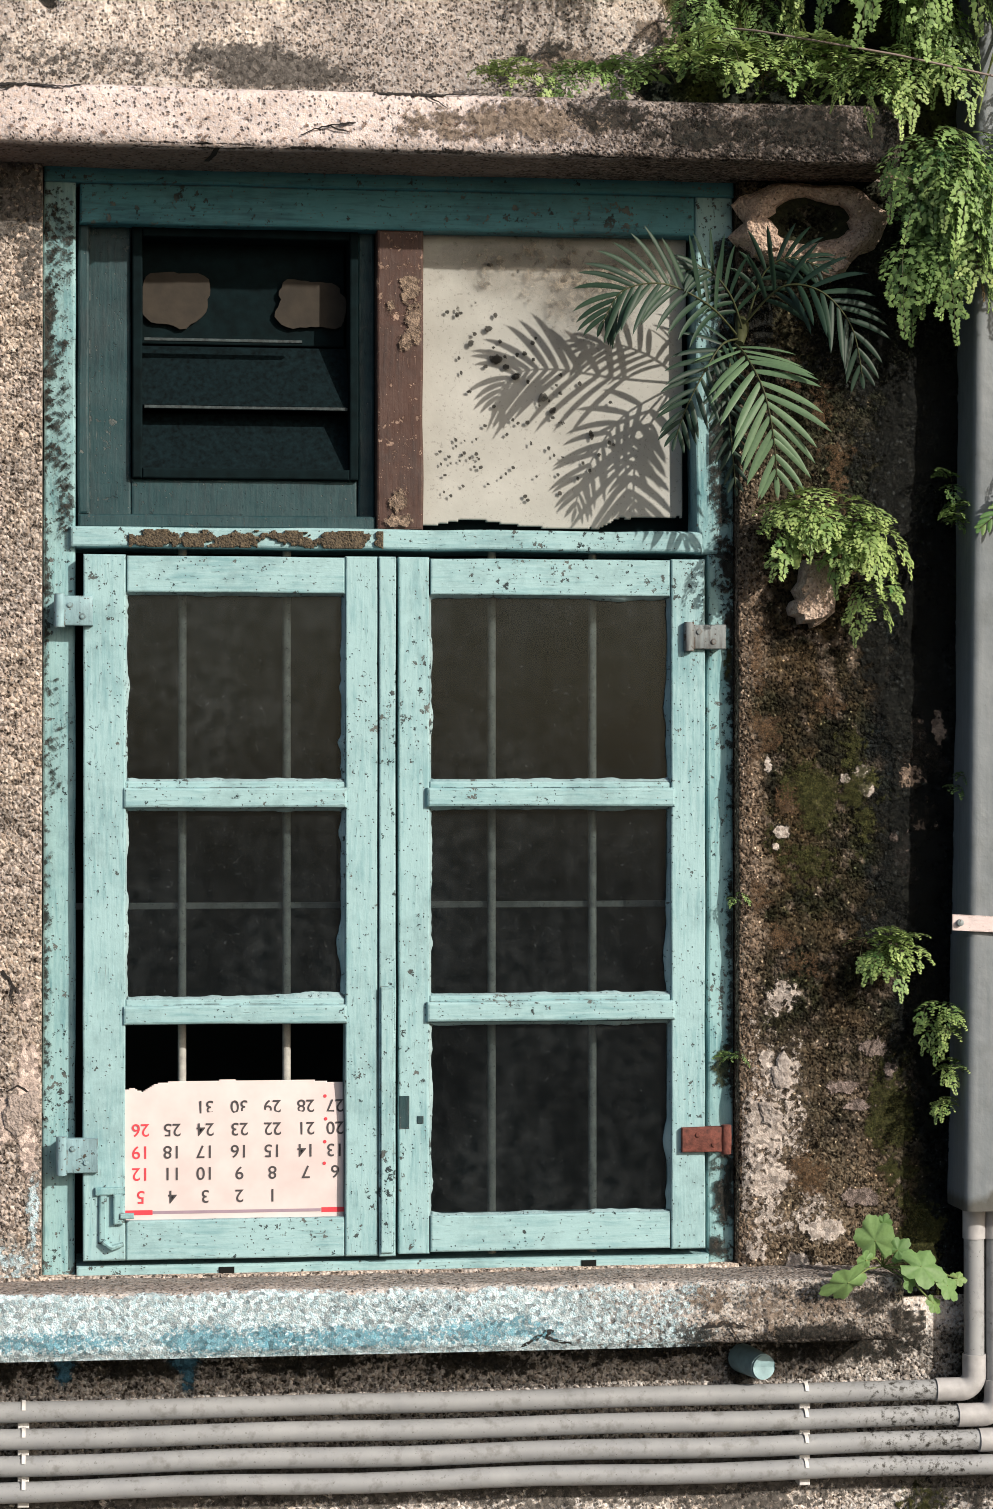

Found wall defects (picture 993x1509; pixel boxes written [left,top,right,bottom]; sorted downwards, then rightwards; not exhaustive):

spalling [39,0,57,12]
spalling [528,46,603,80]
water stain [397,37,904,165]
spalling [629,18,677,48]
water stain [709,238,959,1185]
water stain [709,1137,734,1262]
peeling [0,1281,717,1363]